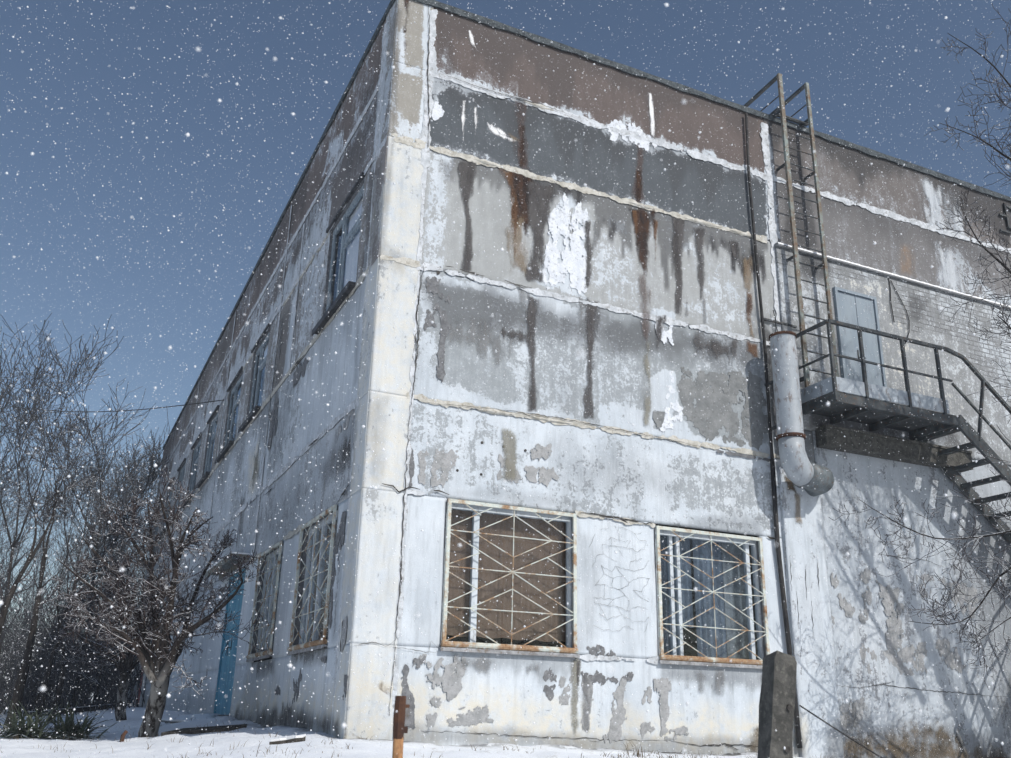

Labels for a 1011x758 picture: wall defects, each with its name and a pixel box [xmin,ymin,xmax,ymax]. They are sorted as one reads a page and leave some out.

leakage [458,161,476,272]
leakage [447,292,538,411]
rust [501,126,532,272]
leakage [526,182,554,282]
leakage [580,220,600,418]
rust [630,171,658,270]
leakage [656,217,707,347]
crack [340,266,714,716]
peeling [830,568,966,676]
peeling [401,654,494,729]
peeling [543,667,634,743]
peeling [640,678,689,742]